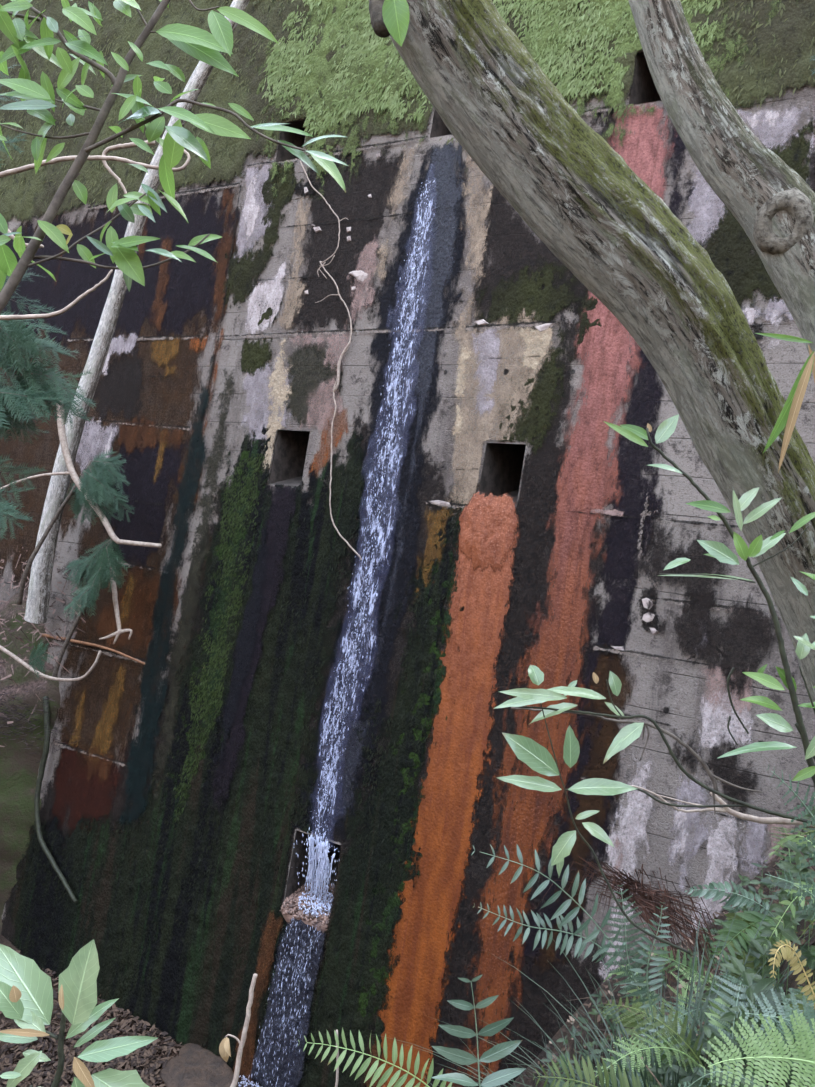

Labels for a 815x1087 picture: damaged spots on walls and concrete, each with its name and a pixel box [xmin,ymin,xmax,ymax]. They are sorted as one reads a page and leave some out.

leakage [591,103,620,149]
leakage [663,117,725,243]
corrosion [0,318,93,587]
corrosion [51,184,249,837]
leakage [211,485,310,813]
corrosion [416,506,454,593]
leakage [241,143,793,1087]
corrosion [579,645,635,781]
leakage [1,764,75,949]
corrosion [555,794,619,922]
corrosion [533,917,571,973]